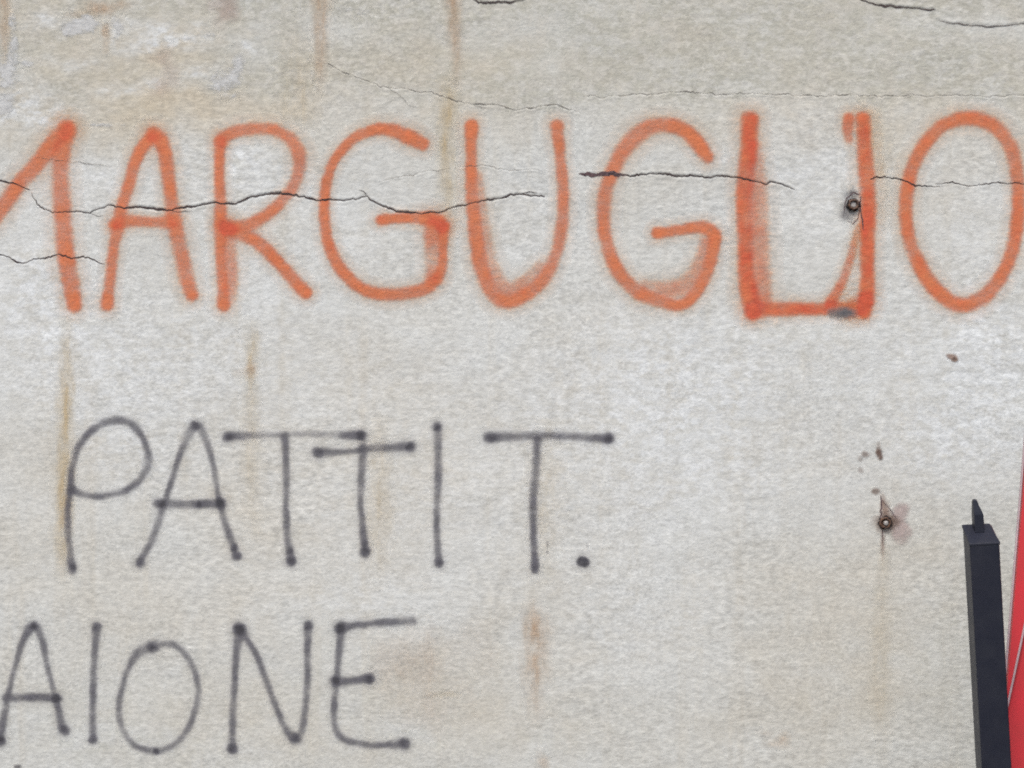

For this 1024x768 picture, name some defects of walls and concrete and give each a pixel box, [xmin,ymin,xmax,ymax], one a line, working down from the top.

crack [862,0,1024,27]
crack [578,168,795,195]
crack [871,176,1024,192]
crack [0,180,545,218]
crack [0,253,105,268]